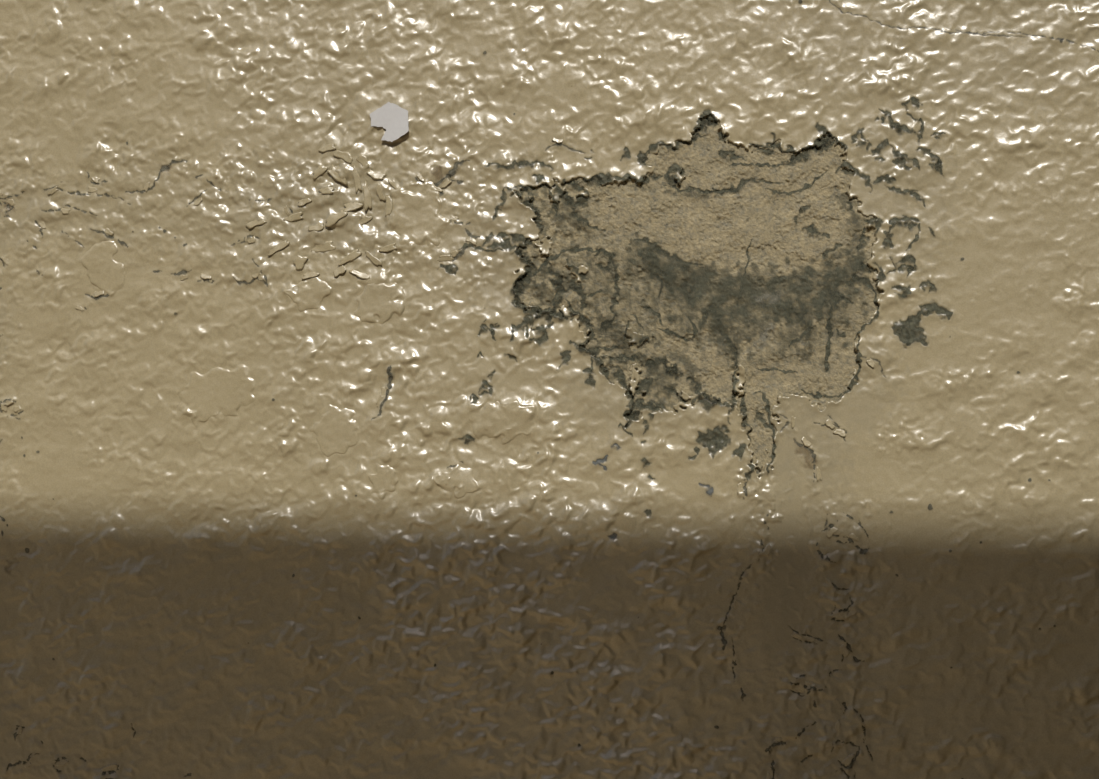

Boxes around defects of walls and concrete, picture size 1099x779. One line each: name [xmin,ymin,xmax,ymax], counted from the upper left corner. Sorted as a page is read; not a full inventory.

crack [0,160,221,276]
crack [255,198,293,216]
crack [153,235,268,285]
crack [75,291,109,311]
peeling [437,97,953,480]
water stain [626,240,872,354]
crack [0,399,23,419]
crack [737,479,747,499]
crack [718,521,771,699]
crack [765,514,873,779]
crack [7,725,119,779]